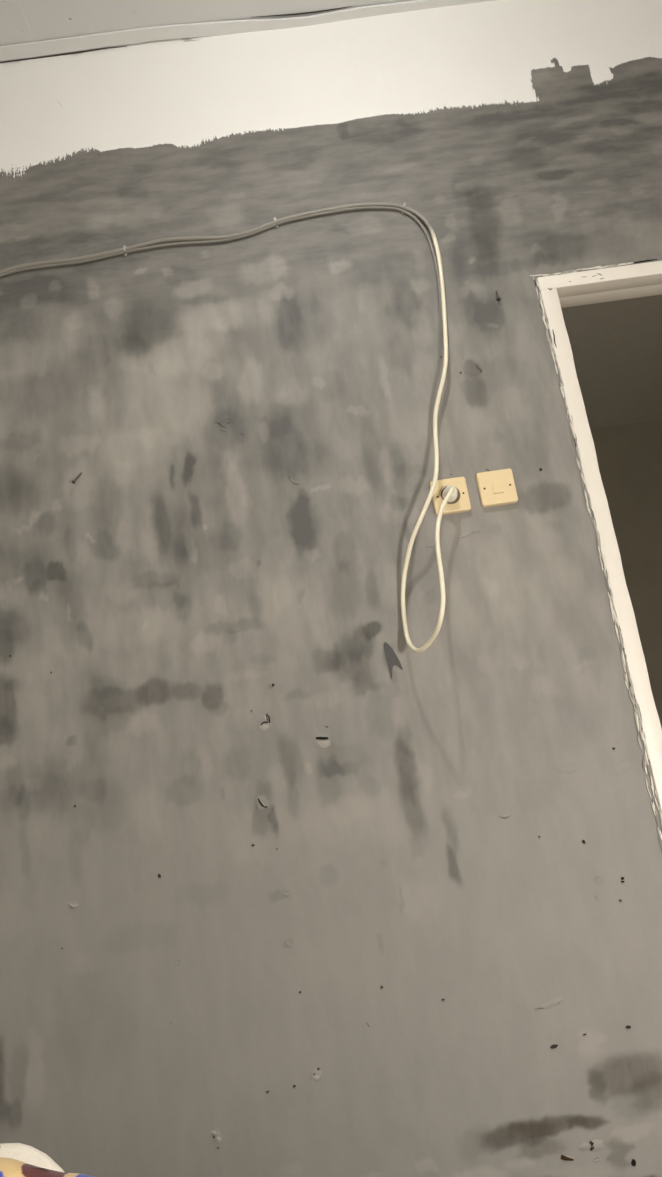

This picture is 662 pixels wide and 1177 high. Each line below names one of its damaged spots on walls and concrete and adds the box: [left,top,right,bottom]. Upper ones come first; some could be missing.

water stain [507,1116,596,1139]